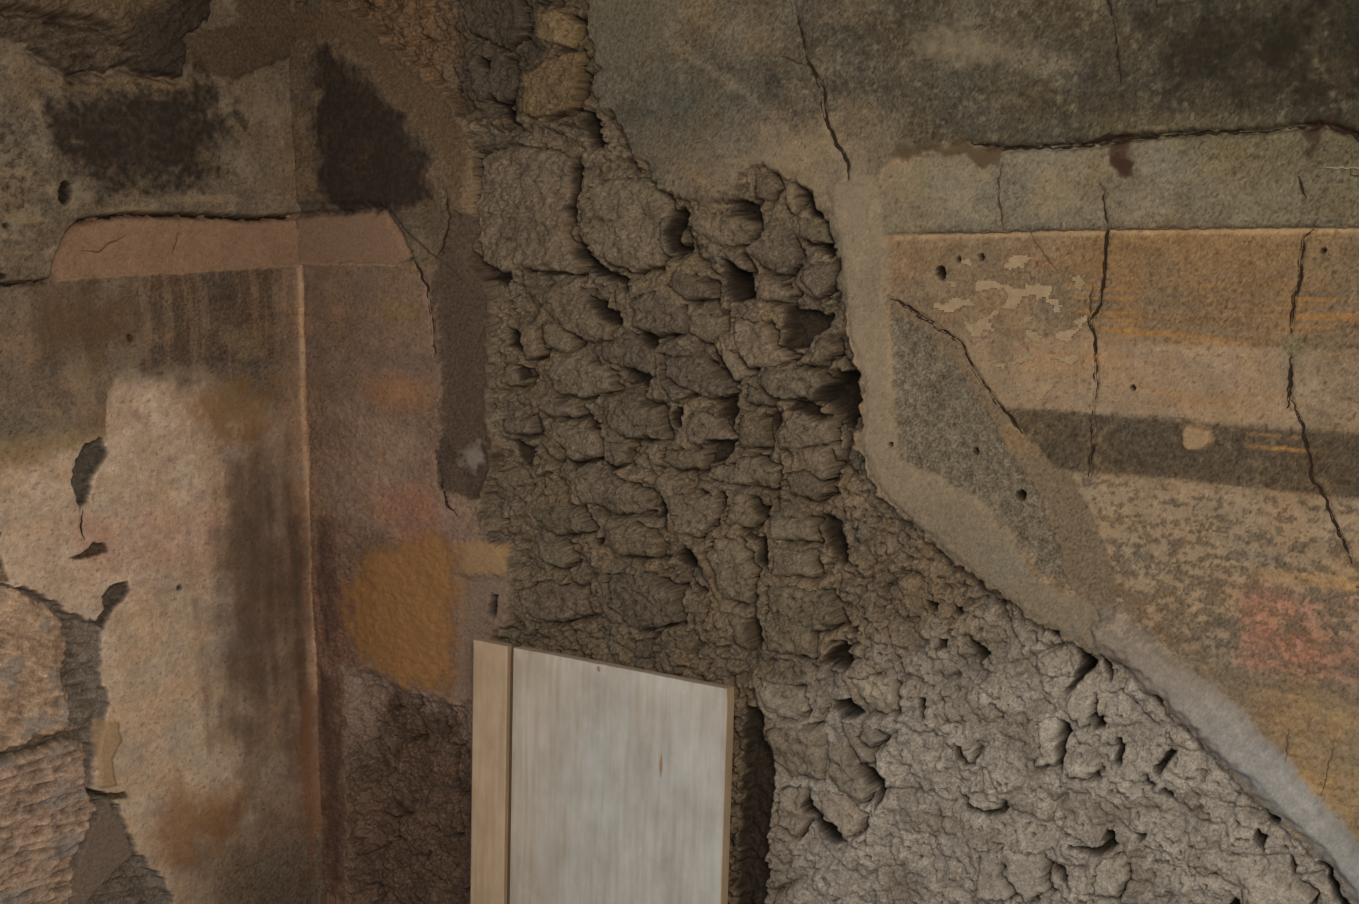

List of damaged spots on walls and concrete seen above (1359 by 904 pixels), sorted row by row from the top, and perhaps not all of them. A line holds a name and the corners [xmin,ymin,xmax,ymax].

crack [781,1,850,180]
spalling [69,541,107,560]
spalling [71,437,108,505]
spalling [323,0,1351,904]
crack [891,298,1023,434]
crack [923,123,1359,588]
spalling [0,558,174,904]